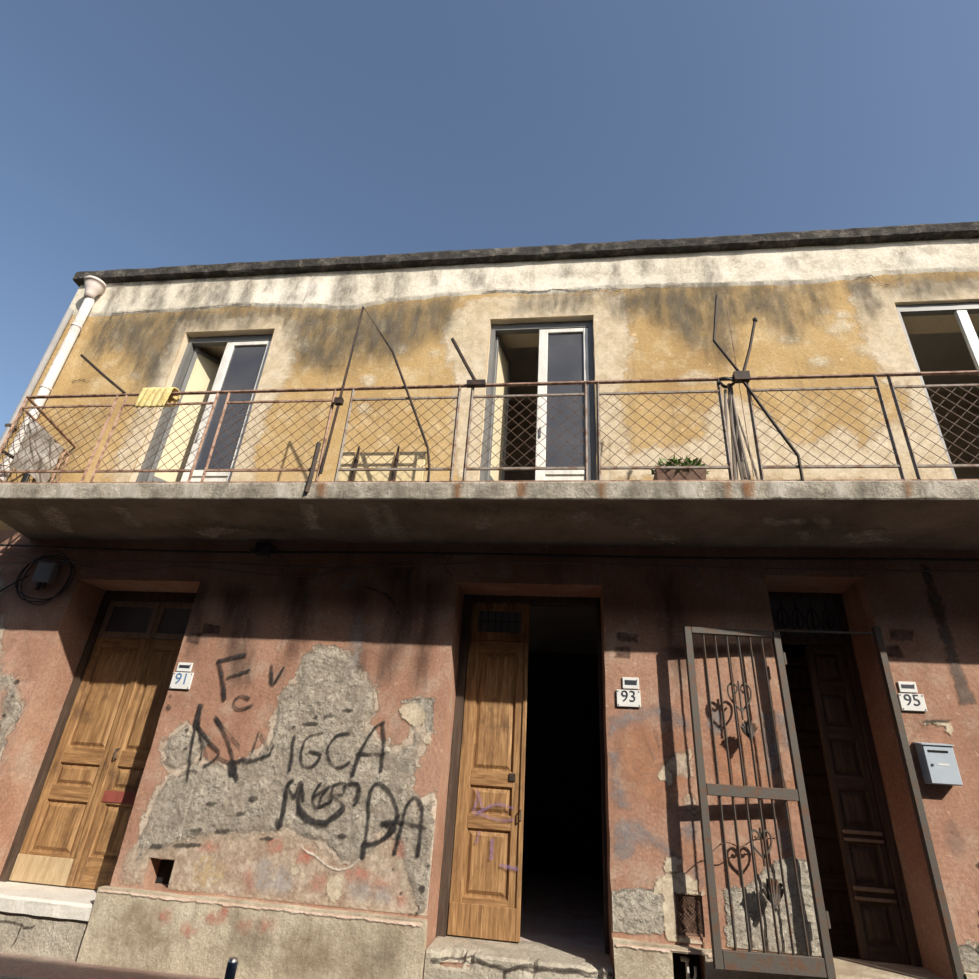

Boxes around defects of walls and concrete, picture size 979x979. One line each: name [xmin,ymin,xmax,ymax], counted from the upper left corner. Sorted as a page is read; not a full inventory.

damp [92,282,280,381]
damp [295,273,451,366]
damp [621,288,702,337]
spalling [0,566,37,763]
spalling [120,644,438,916]
peeling [621,729,698,815]
spalling [612,844,705,945]
crack [431,955,613,979]
spalling [958,939,979,973]